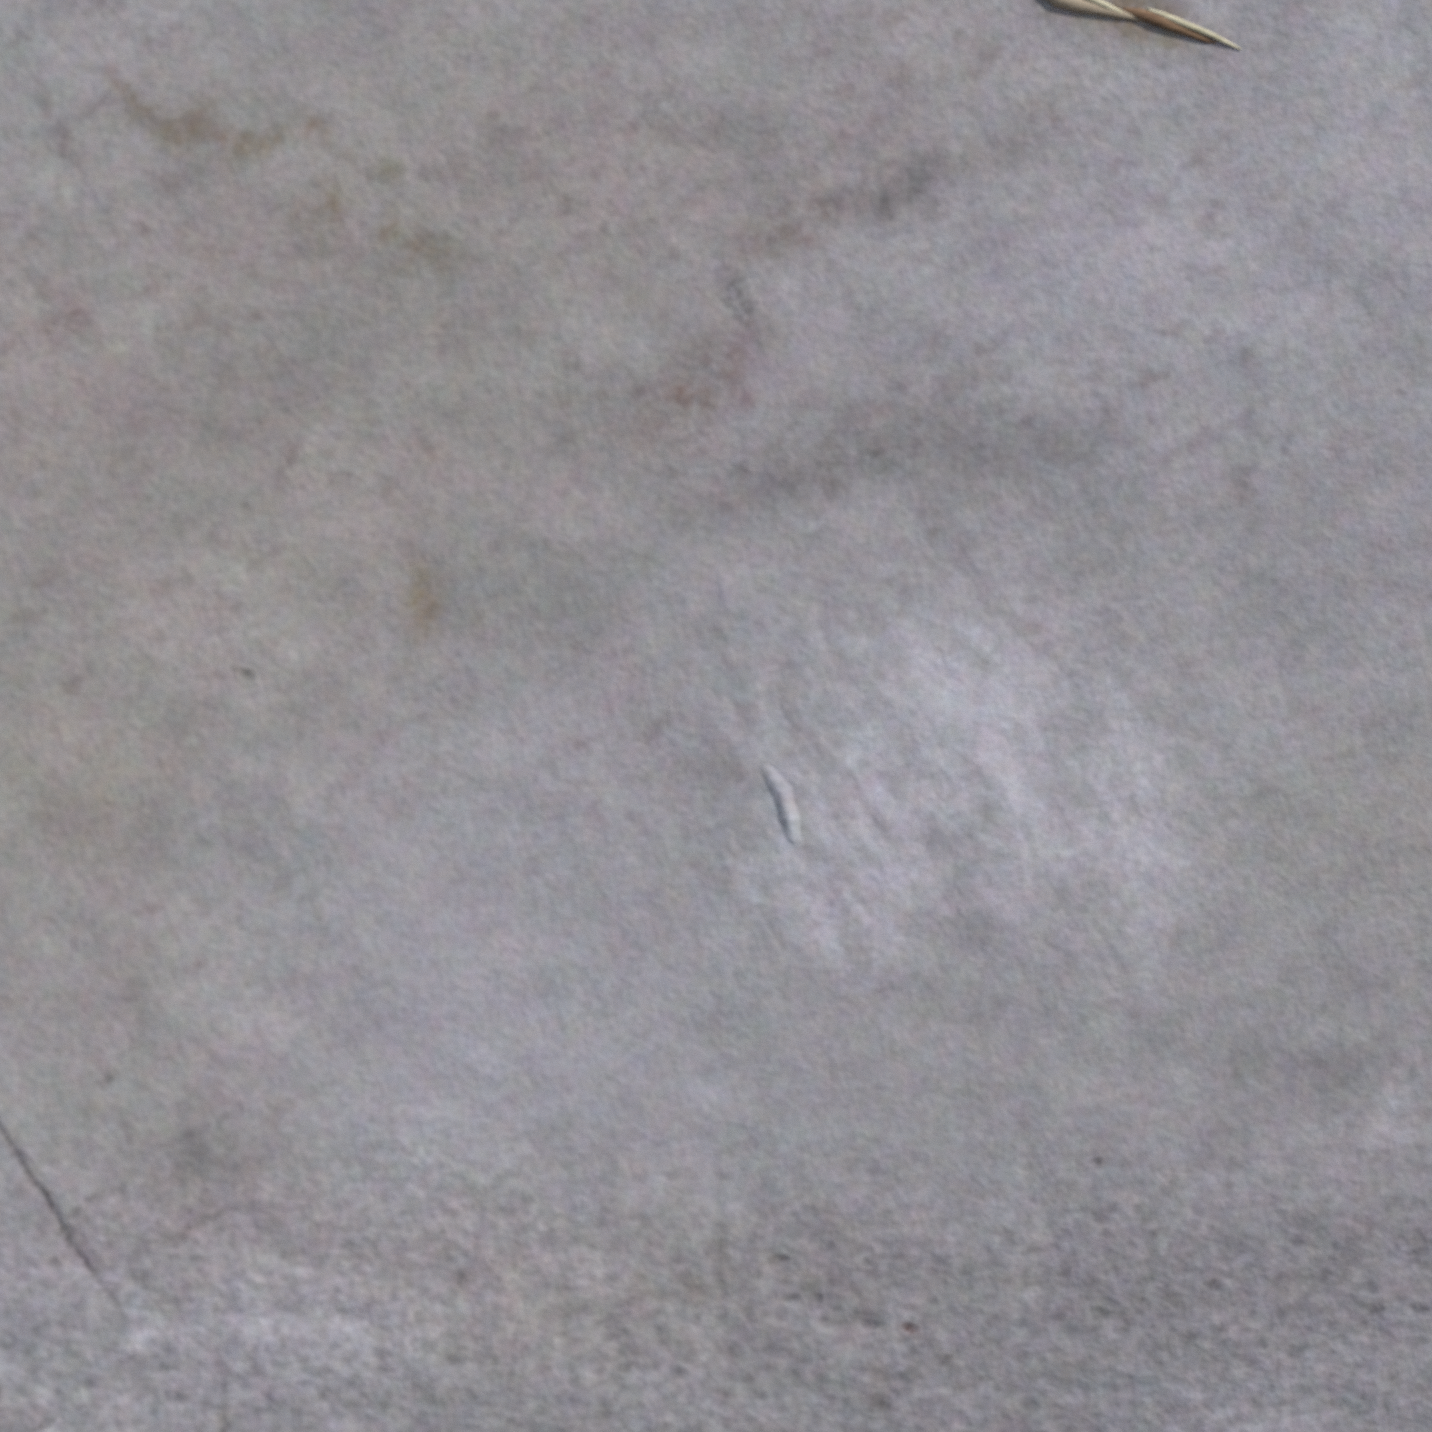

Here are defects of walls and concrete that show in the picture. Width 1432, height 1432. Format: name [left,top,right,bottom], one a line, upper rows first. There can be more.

crack [0,1119,128,1319]